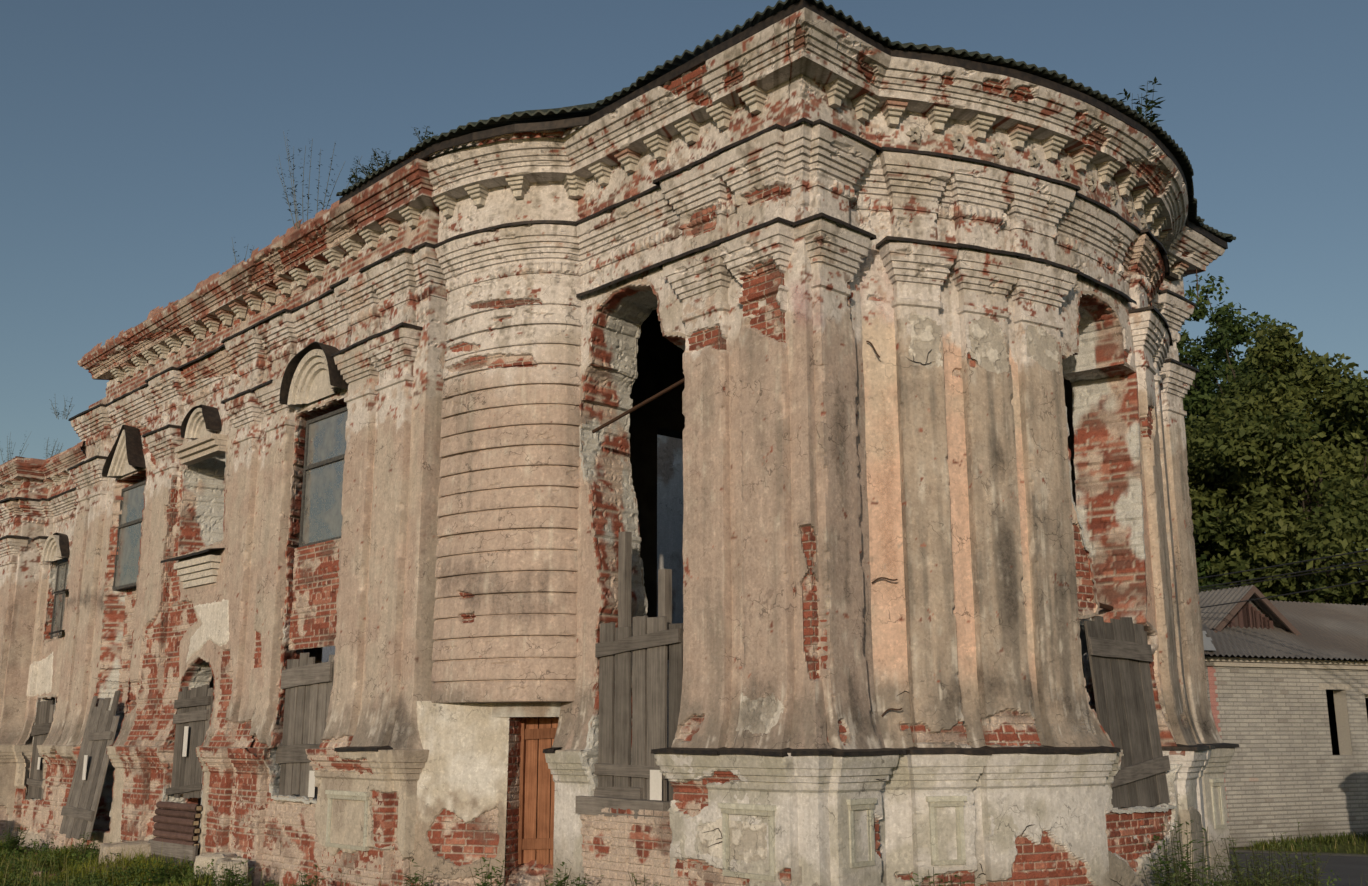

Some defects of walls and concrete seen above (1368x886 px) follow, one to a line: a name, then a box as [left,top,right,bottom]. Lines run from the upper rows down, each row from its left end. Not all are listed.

spalling [982,80,1034,103]
spalling [744,185,791,206]
spalling [469,299,542,322]
spalling [739,259,786,343]
spalling [447,343,537,372]
spalling [801,526,828,680]
spalling [115,472,197,842]
spalling [12,751,100,853]
spalling [199,651,506,886]
peeling [670,771,768,886]
spalling [899,710,1041,746]
spalling [895,831,1093,886]